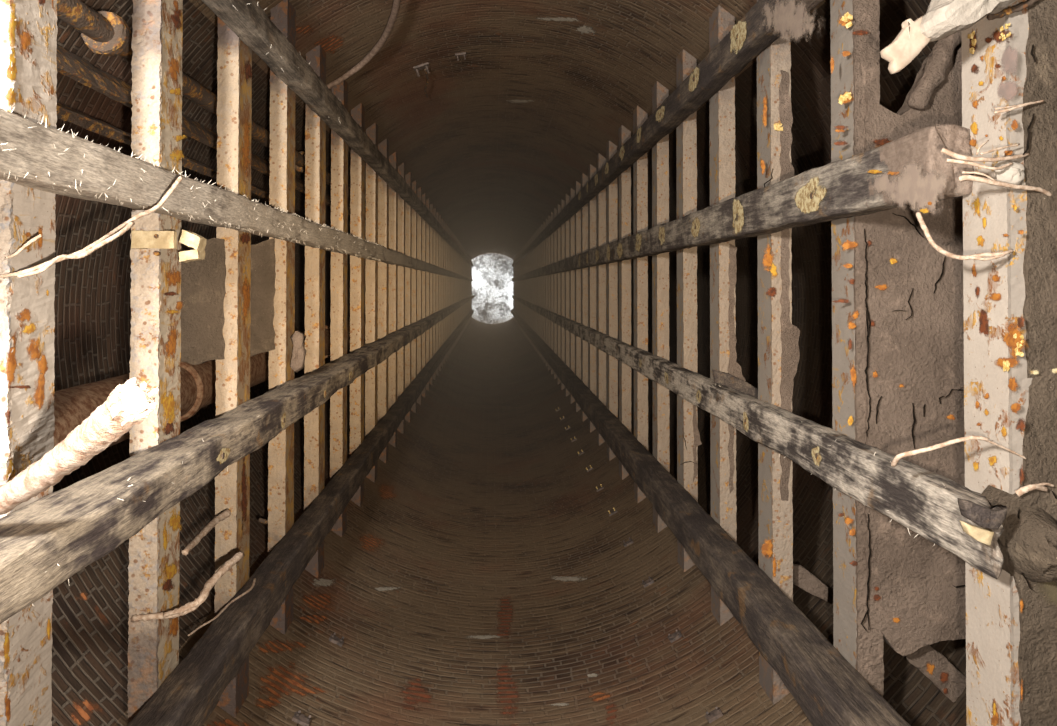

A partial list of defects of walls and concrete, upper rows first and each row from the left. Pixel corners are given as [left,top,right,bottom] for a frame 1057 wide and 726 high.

rust [839,12,868,35]
rust [5,3,31,107]
rust [967,23,1013,86]
rust [838,92,852,105]
rust [969,122,1013,156]
rust [974,197,986,247]
rust [164,271,183,314]
rust [972,264,1001,336]
rust [6,309,48,409]
rust [162,391,175,435]
rust [6,460,16,482]
crack [861,514,871,631]